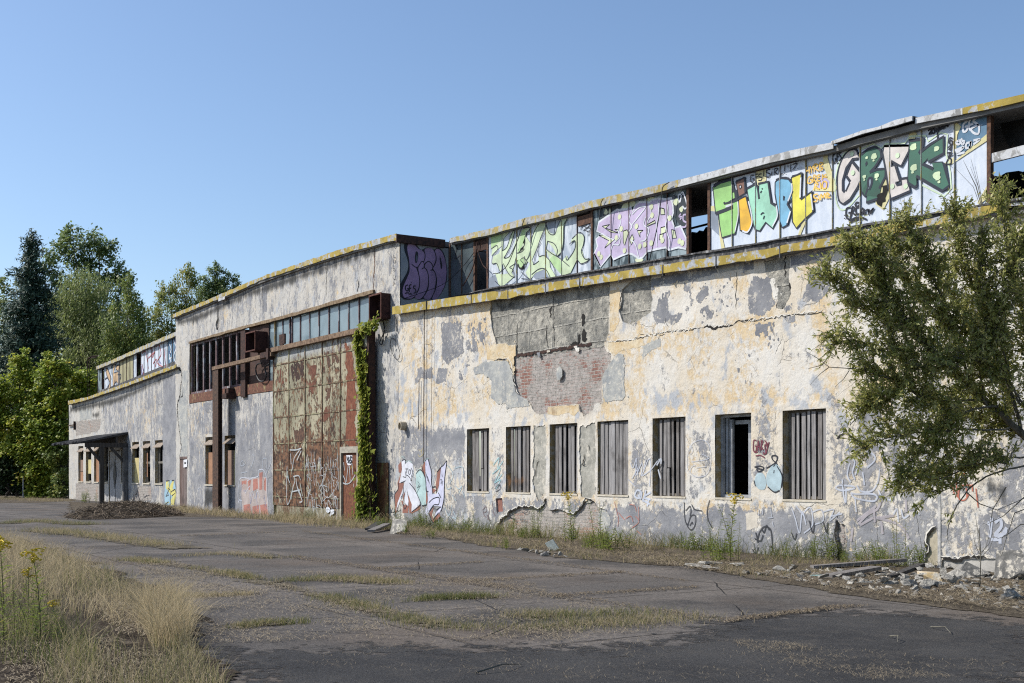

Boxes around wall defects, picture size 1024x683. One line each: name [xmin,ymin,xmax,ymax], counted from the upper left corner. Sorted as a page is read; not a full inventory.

crack [614,256,824,342]
flaking render [415,250,831,539]
crack [486,461,594,530]
peeling [926,511,1022,572]